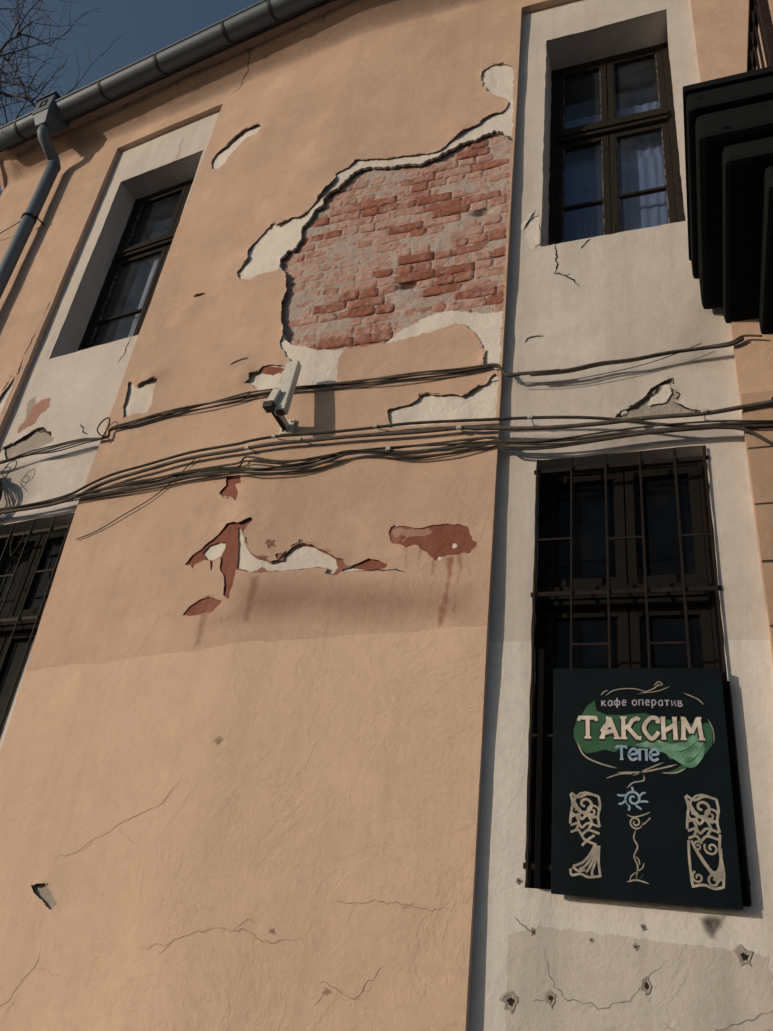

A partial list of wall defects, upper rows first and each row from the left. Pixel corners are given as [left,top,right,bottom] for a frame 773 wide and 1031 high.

peeling [212,123,261,169]
flaking render [237,62,540,428]
crack [526,210,590,287]
flaking render [615,377,701,419]
flaking render [0,396,55,460]
peeling [389,524,477,561]
peeling [184,518,404,616]
crack [329,899,449,922]
crack [136,919,301,954]
crack [316,968,380,1004]
crack [516,918,667,1010]
crack [716,1011,772,1031]